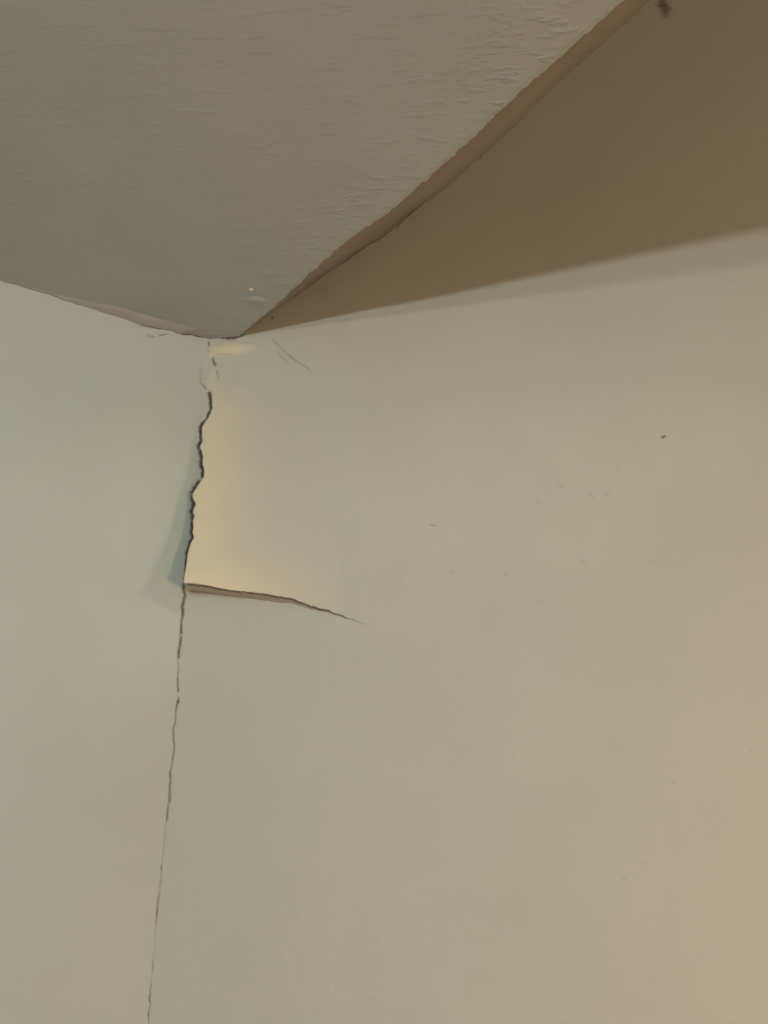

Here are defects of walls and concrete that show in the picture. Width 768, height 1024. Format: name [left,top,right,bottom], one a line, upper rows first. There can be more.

crack [176,392,212,710]